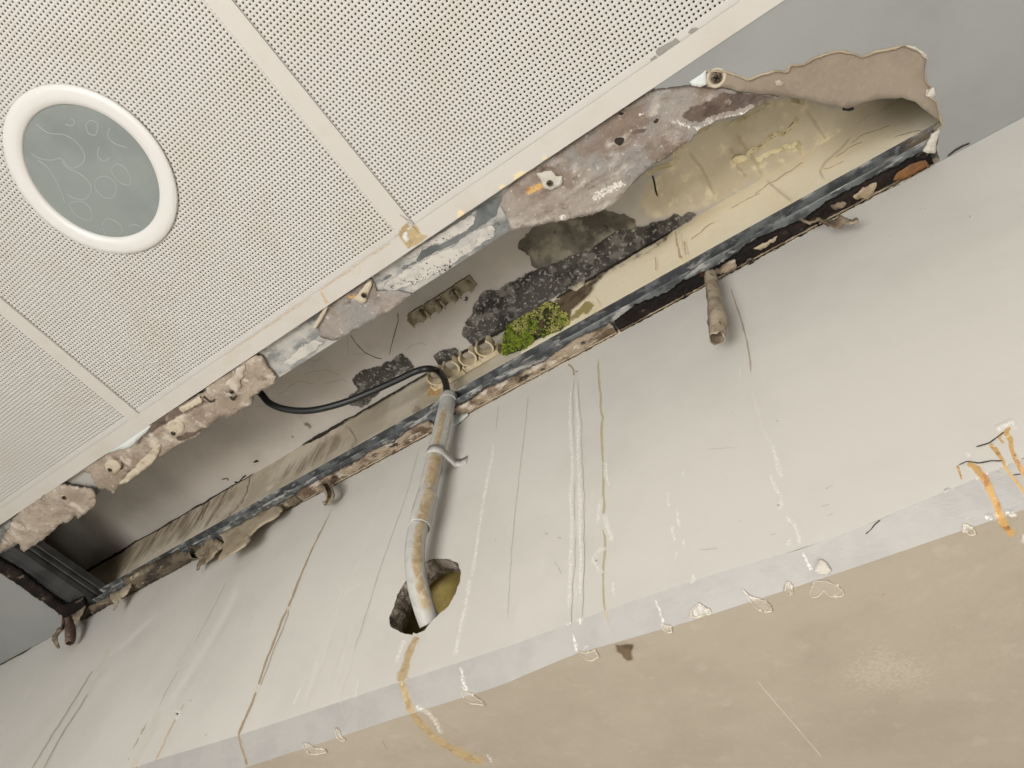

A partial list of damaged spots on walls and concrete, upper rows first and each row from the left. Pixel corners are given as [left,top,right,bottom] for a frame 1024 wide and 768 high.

flaking render [633,44,943,225]
leakage [458,175,696,344]
rust [409,374,451,623]
leakage [565,351,618,654]
rust [954,449,1020,541]
rust [987,418,1024,496]
hole [389,582,427,635]
hole [426,559,461,615]
rust [392,632,495,768]